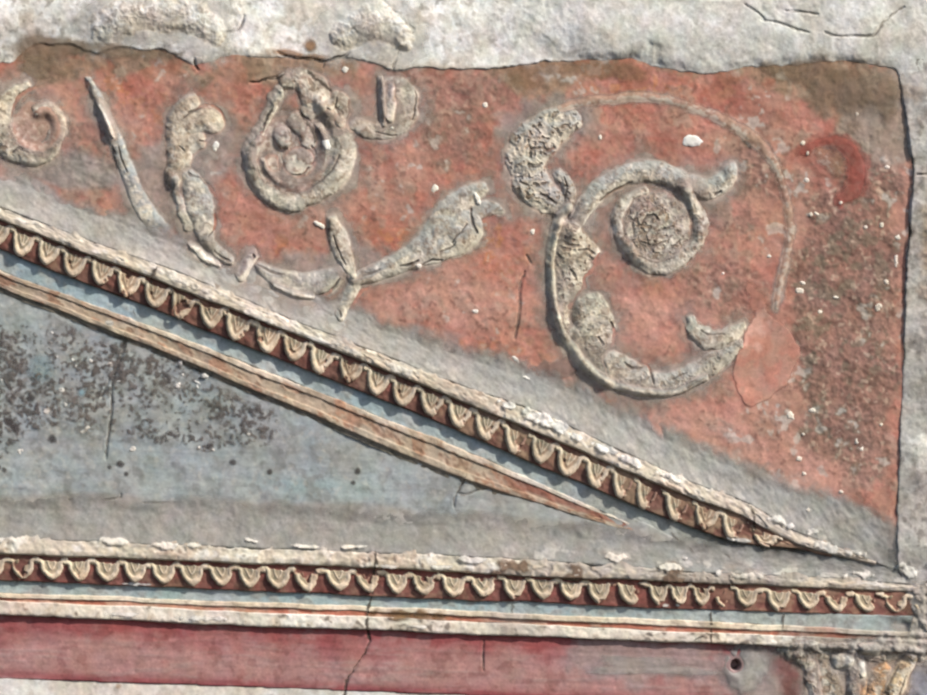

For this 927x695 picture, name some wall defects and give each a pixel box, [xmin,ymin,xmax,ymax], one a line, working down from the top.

crack [343,551,378,695]